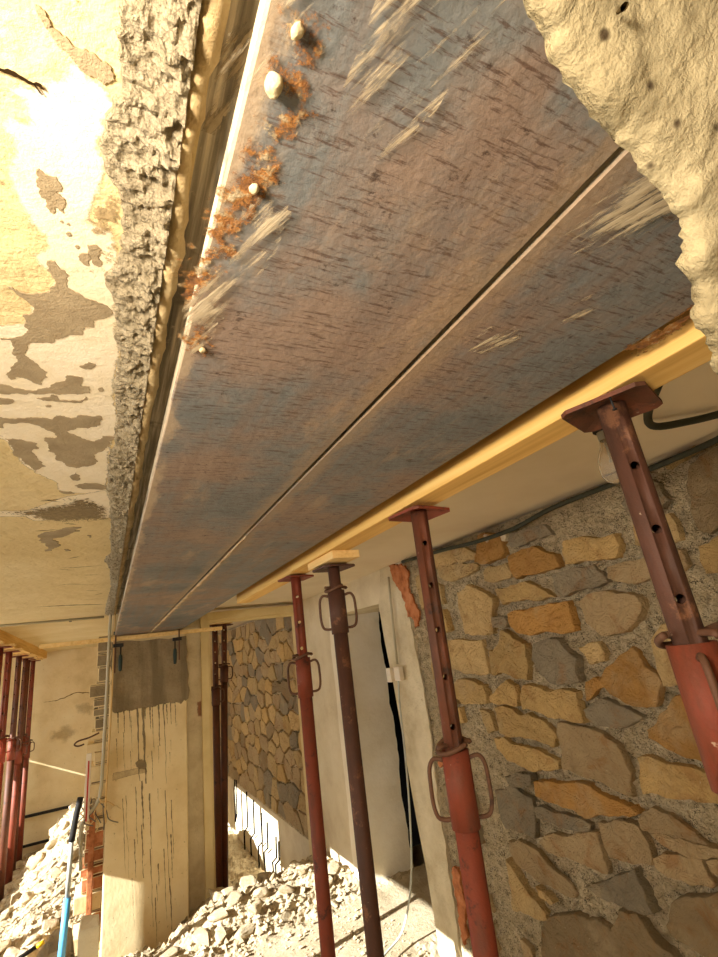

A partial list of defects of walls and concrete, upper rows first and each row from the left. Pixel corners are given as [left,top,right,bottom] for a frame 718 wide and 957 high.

crack [0,68,44,95]
corrosion [177,5,330,307]
peeling [0,4,122,552]
corrosion [179,325,214,357]
leakage [116,702,176,937]